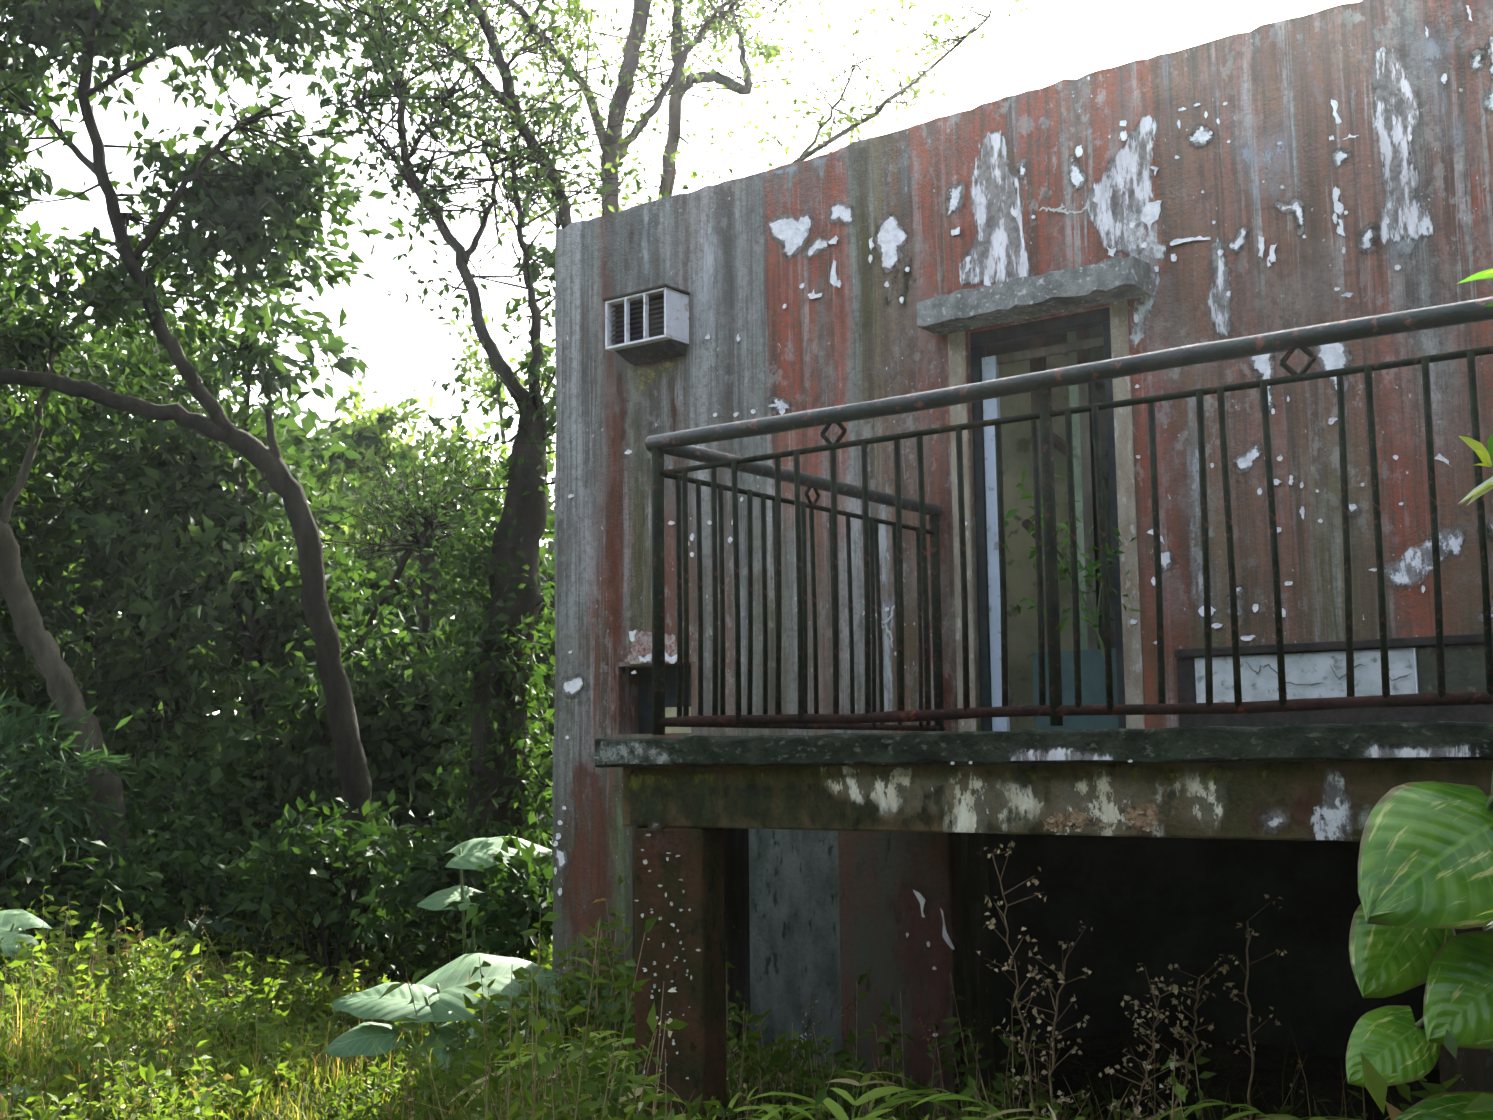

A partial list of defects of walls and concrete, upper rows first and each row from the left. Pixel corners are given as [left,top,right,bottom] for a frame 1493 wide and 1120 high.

peeling [1015,157,1027,179]
peeling [1068,145,1087,191]
peeling [768,200,855,299]
peeling [868,212,910,303]
corrosion [606,373,625,725]
peeling [1368,528,1465,593]
spalling [1043,800,1159,835]